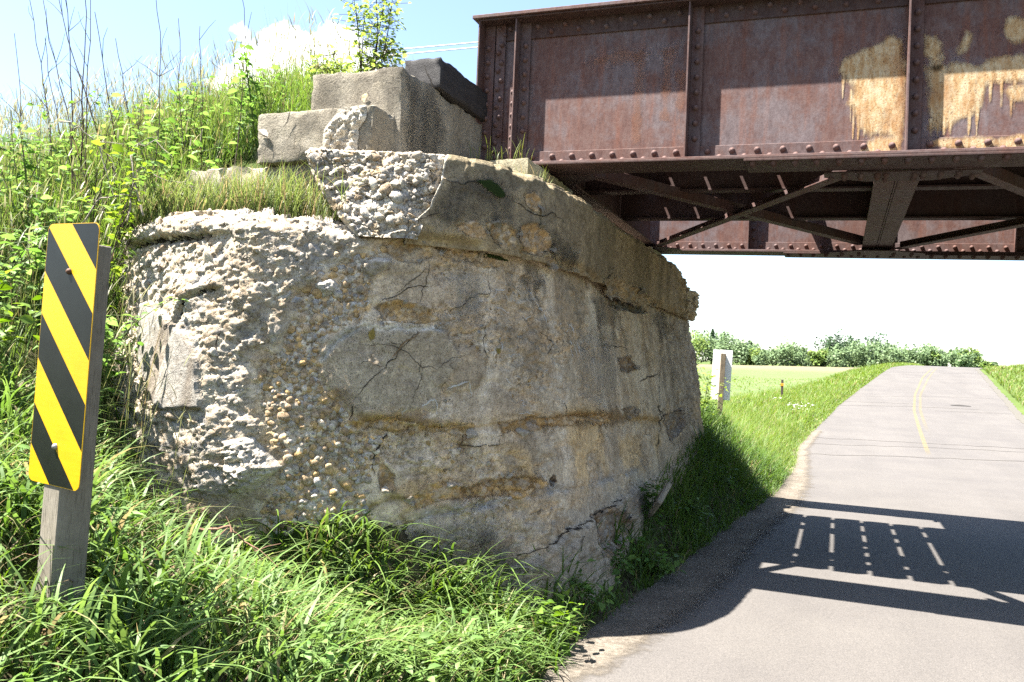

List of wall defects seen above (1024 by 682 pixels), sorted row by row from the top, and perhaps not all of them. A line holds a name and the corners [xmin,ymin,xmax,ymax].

rust [1005,17,1024,42]
rust [839,36,906,151]
rust [924,32,1024,148]
spalling [305,93,557,277]
crack [349,327,488,420]
crack [518,499,622,556]